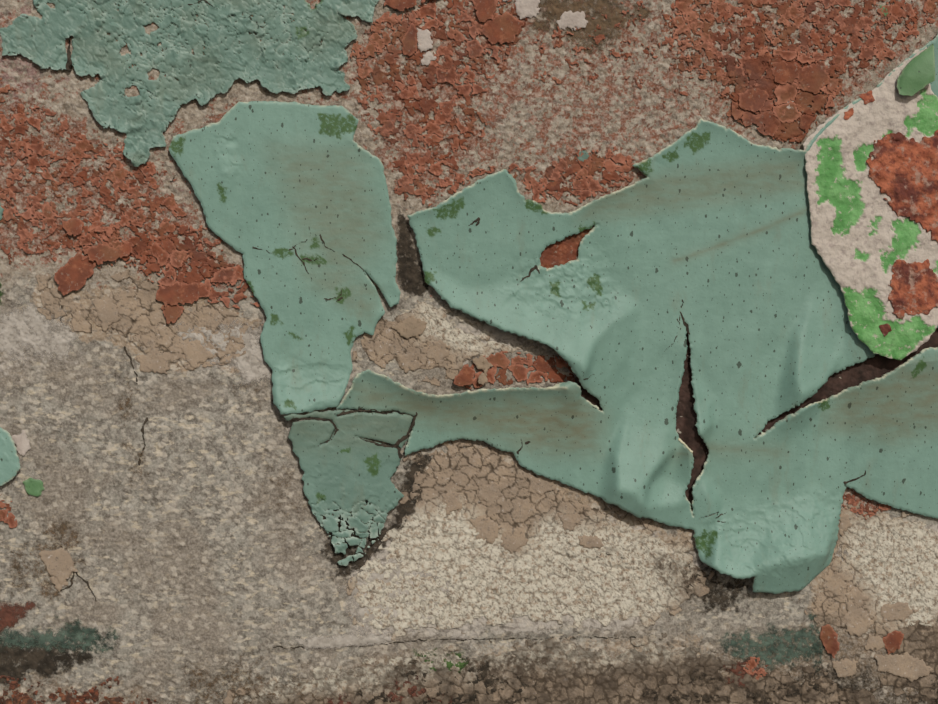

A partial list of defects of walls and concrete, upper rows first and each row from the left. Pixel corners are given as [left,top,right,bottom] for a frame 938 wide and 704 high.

peeling [0,0,540,295]
peeling [533,10,614,87]
peeling [662,0,938,143]
peeling [121,32,938,594]
peeling [0,675,156,704]
crack [223,407,938,704]